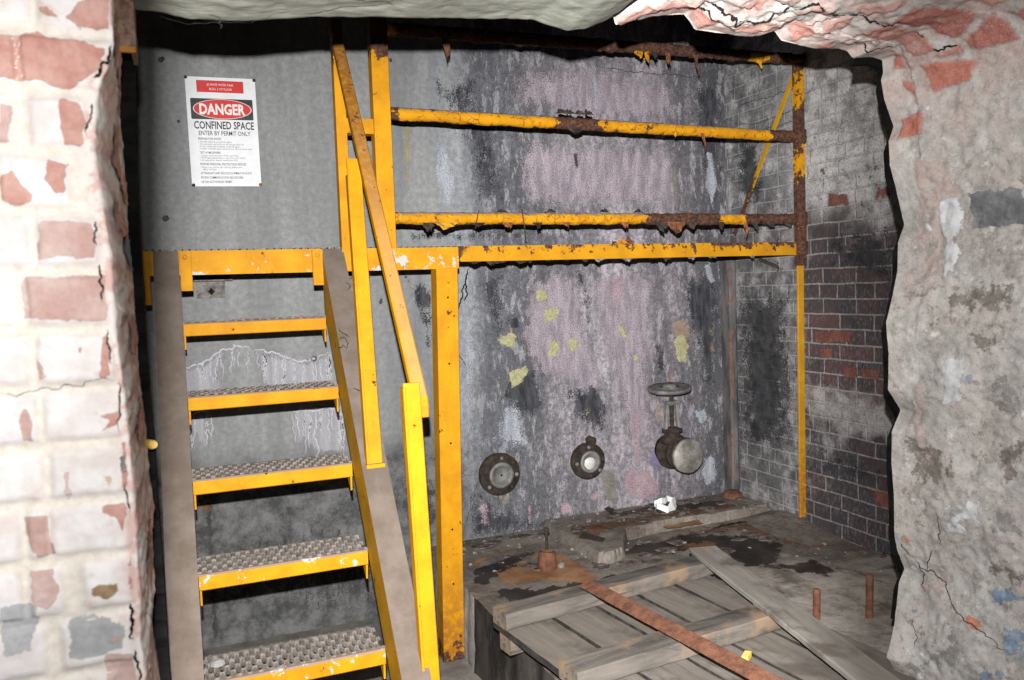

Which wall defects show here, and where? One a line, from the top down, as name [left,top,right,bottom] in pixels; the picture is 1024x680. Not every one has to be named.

crack [698,2,957,53]
peeling [0,0,122,146]
crack [94,46,112,77]
damp [435,78,685,213]
peeling [0,170,32,206]
peeling [37,220,96,260]
crack [93,221,104,300]
peeling [22,275,108,322]
damp [185,344,333,391]
damp [292,405,345,456]
rust [496,553,596,585]
damp [626,534,836,577]